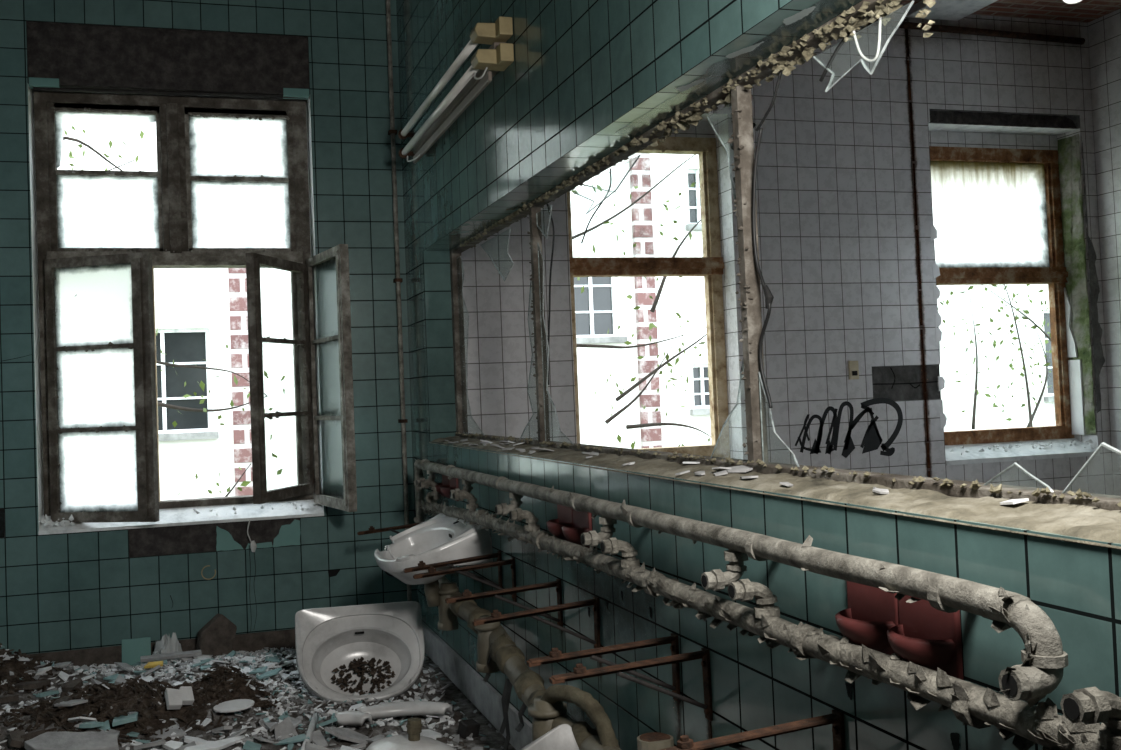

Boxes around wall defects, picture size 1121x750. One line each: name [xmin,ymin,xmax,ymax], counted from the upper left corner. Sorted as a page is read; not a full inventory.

peeling [783,6,816,25]
flaking render [831,3,893,42]
flaking render [915,0,936,37]
spalling [27,23,309,93]
peeling [726,41,764,58]
flaking render [772,50,817,76]
peeling [129,518,301,557]